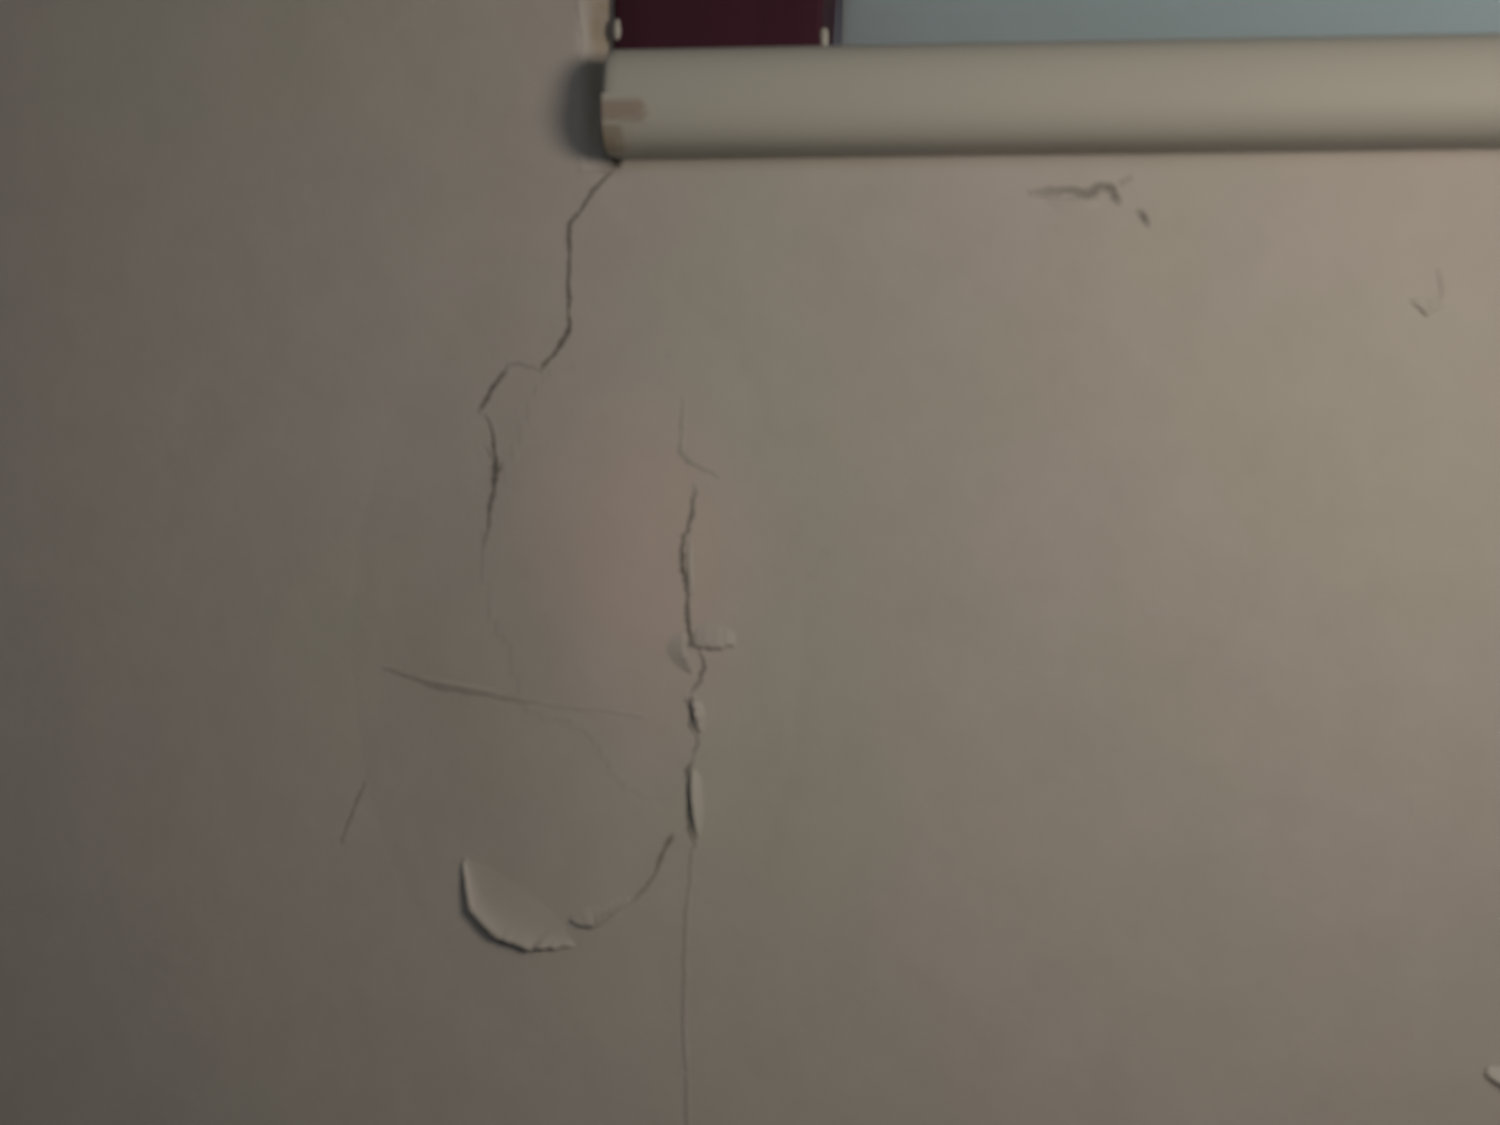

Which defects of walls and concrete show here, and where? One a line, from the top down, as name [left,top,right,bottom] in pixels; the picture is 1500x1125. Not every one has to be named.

crack [478,167,617,549]
crack [629,397,736,1125]